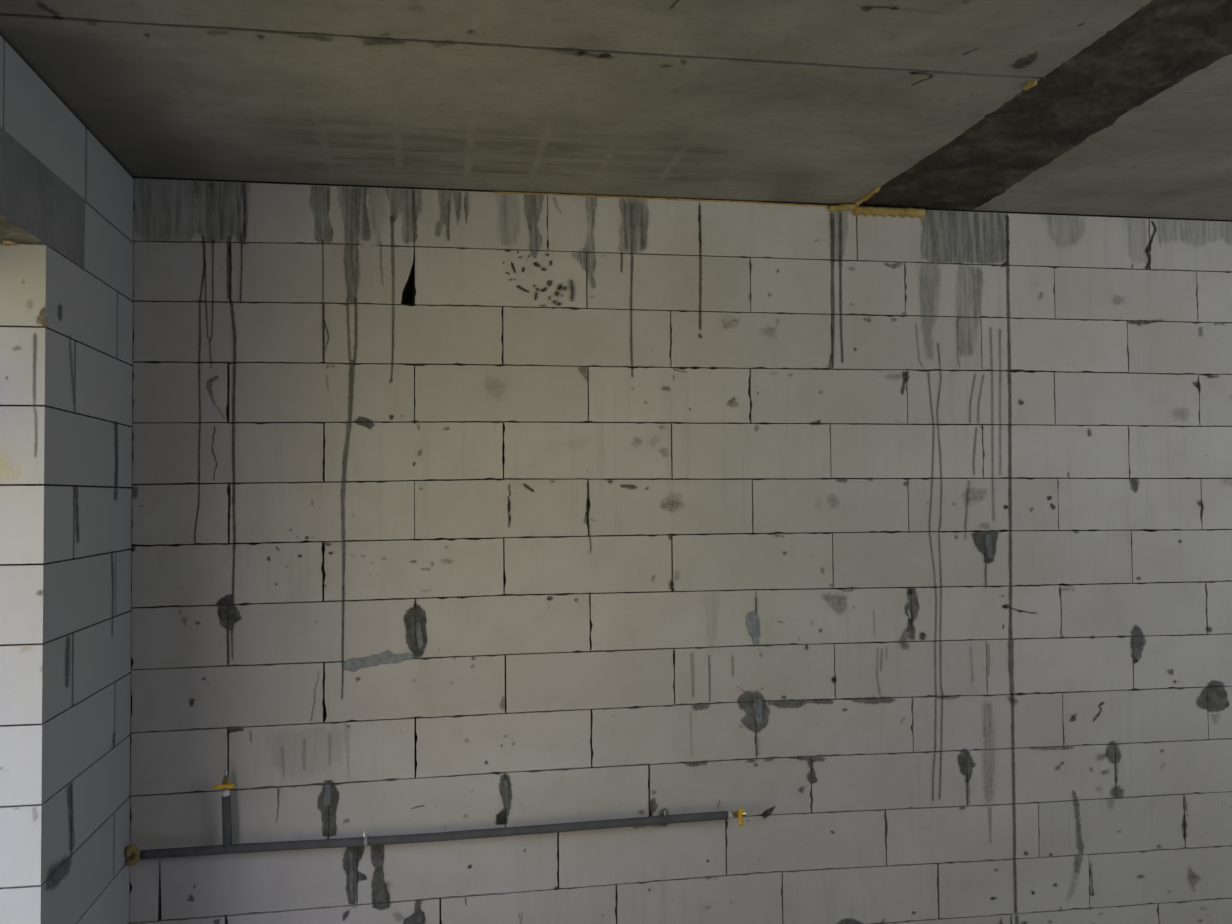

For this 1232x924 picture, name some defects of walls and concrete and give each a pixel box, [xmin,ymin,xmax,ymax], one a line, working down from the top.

leakage [620,198,648,377]
leakage [828,212,844,368]
crack [1132,221,1157,269]
leakage [194,182,247,594]